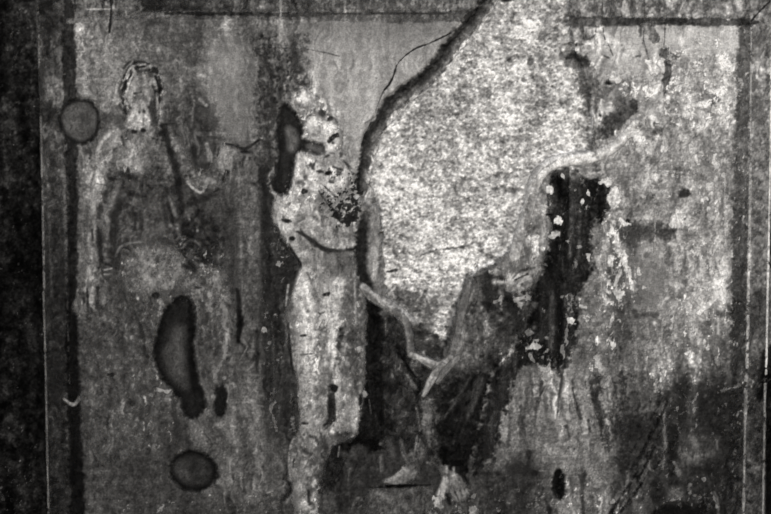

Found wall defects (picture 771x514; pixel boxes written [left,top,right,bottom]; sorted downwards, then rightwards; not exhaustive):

crack [382,32,451,94]
water stain [256,34,310,179]
peeling [267,228,290,282]
flaking render [273,0,750,437]
peeling [259,298,285,367]
peeling [552,147,752,514]
peeling [706,363,771,441]